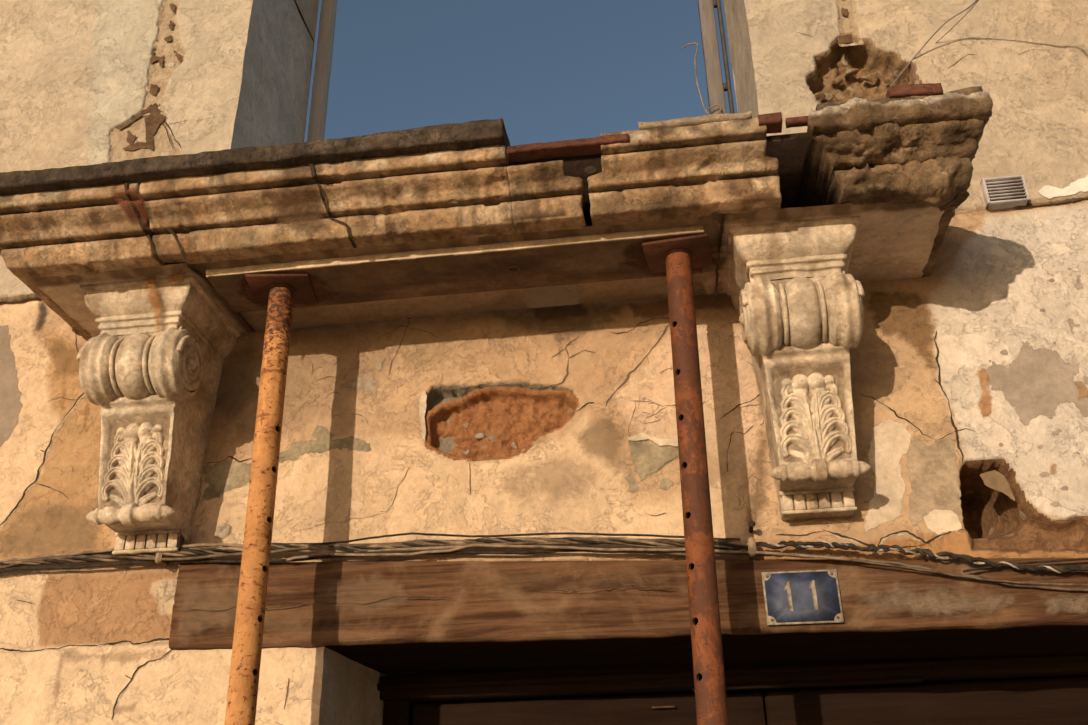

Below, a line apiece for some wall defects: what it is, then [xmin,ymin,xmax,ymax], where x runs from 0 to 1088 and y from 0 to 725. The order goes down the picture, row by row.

crack [309,163,357,248]
peeling [0,325,22,446]
crack [0,393,99,528]
flaking render [202,460,251,500]
flaking render [279,425,371,463]
spalling [419,381,579,462]
crack [550,318,675,437]
crack [703,394,771,510]
crack [861,330,973,462]
flaking render [864,418,1088,554]
peeling [983,341,1088,435]
crack [0,638,173,720]